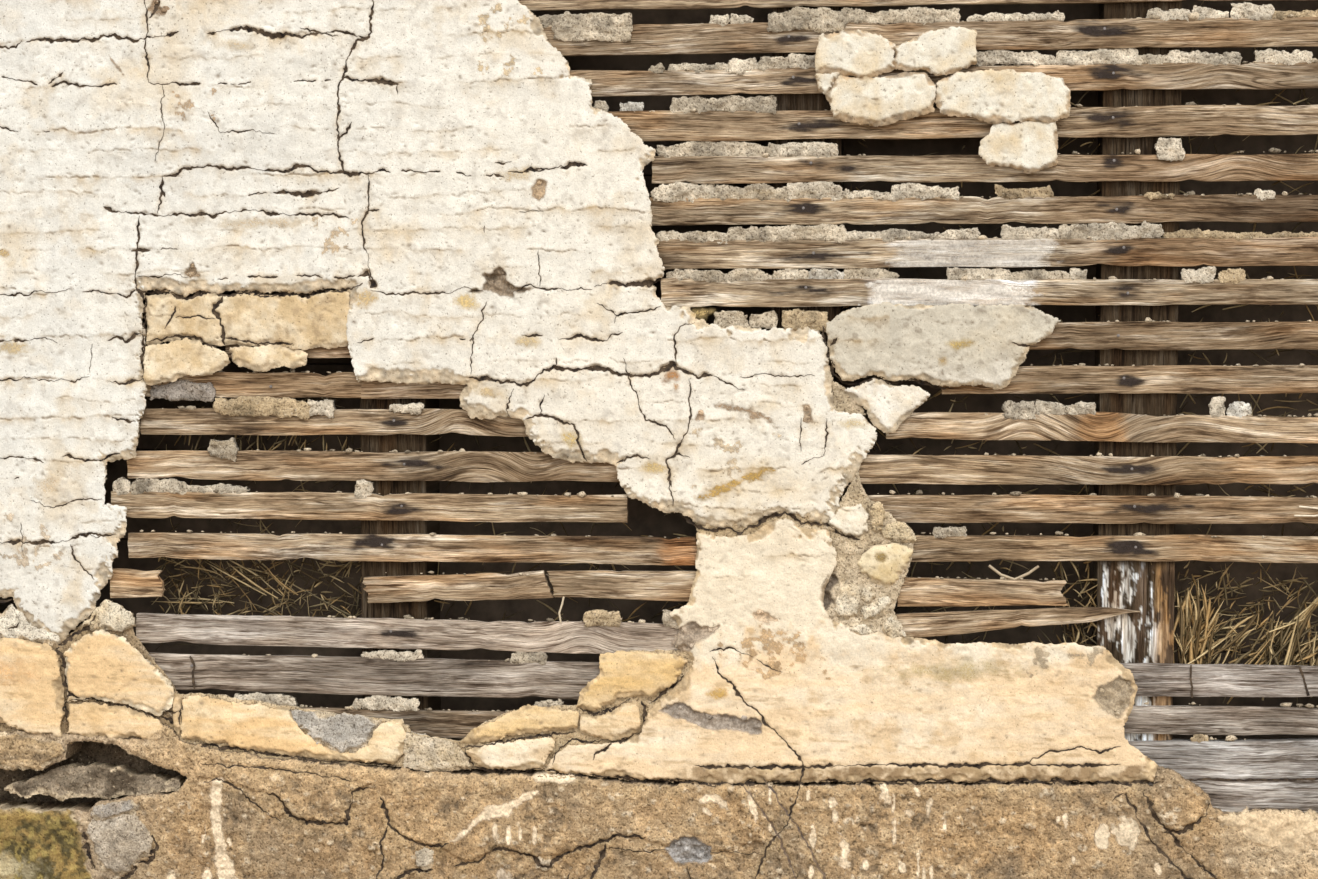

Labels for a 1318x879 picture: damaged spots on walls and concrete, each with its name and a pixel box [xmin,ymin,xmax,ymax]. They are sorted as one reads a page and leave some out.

spalling [532,179,547,200]
spalling [185,263,200,277]
crack [0,0,953,540]
spalling [470,267,531,297]
spalling [803,405,813,423]
crack [0,453,120,578]
spalling [823,574,838,610]
spalling [672,622,723,651]
peeling [740,609,806,679]
spalling [1093,676,1134,719]
spalling [661,702,762,734]
crack [55,615,1318,879]